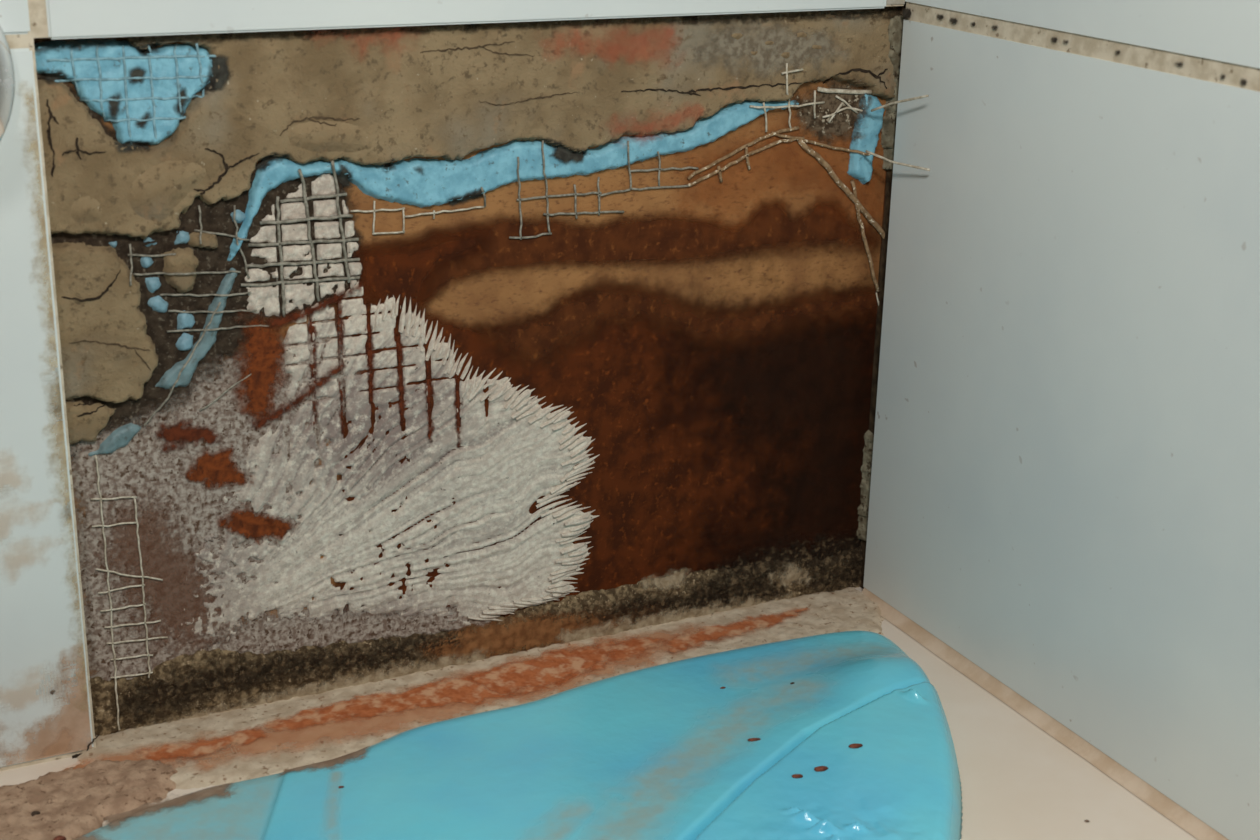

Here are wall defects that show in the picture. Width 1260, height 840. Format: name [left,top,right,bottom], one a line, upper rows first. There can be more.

crack [46,99,106,177]
water stain [37,73,118,141]
peeling [34,41,212,145]
spalling [794,80,871,145]
peeling [174,231,190,245]
crack [62,116,360,302]
peeling [140,237,195,351]
corrosion [396,335,406,425]
corrosion [156,420,245,488]
water stain [29,137,881,736]
corrosion [219,503,293,543]
corrosion [104,608,808,767]